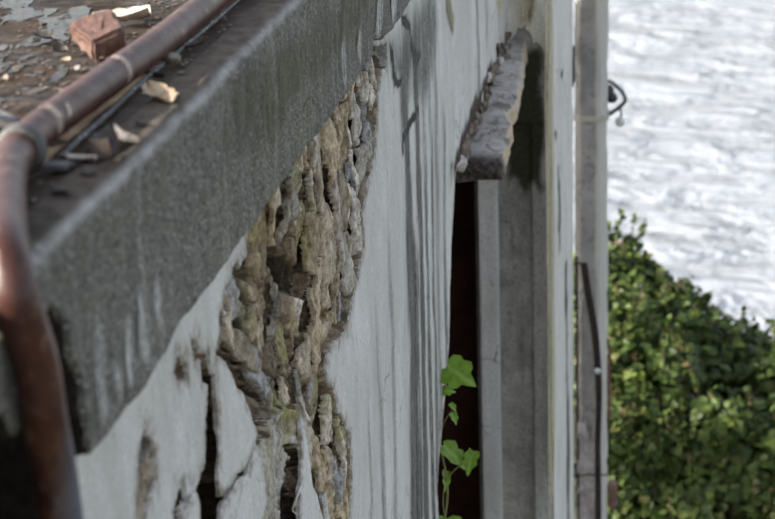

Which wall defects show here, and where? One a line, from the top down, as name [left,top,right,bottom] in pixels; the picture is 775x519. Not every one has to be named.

damp [376,0,397,35]
damp [446,0,454,31]
spalling [451,24,512,175]
spalling [191,57,382,519]
damp [393,0,448,519]
peeling [174,358,185,381]
peeling [136,432,154,519]
peeling [177,492,201,519]